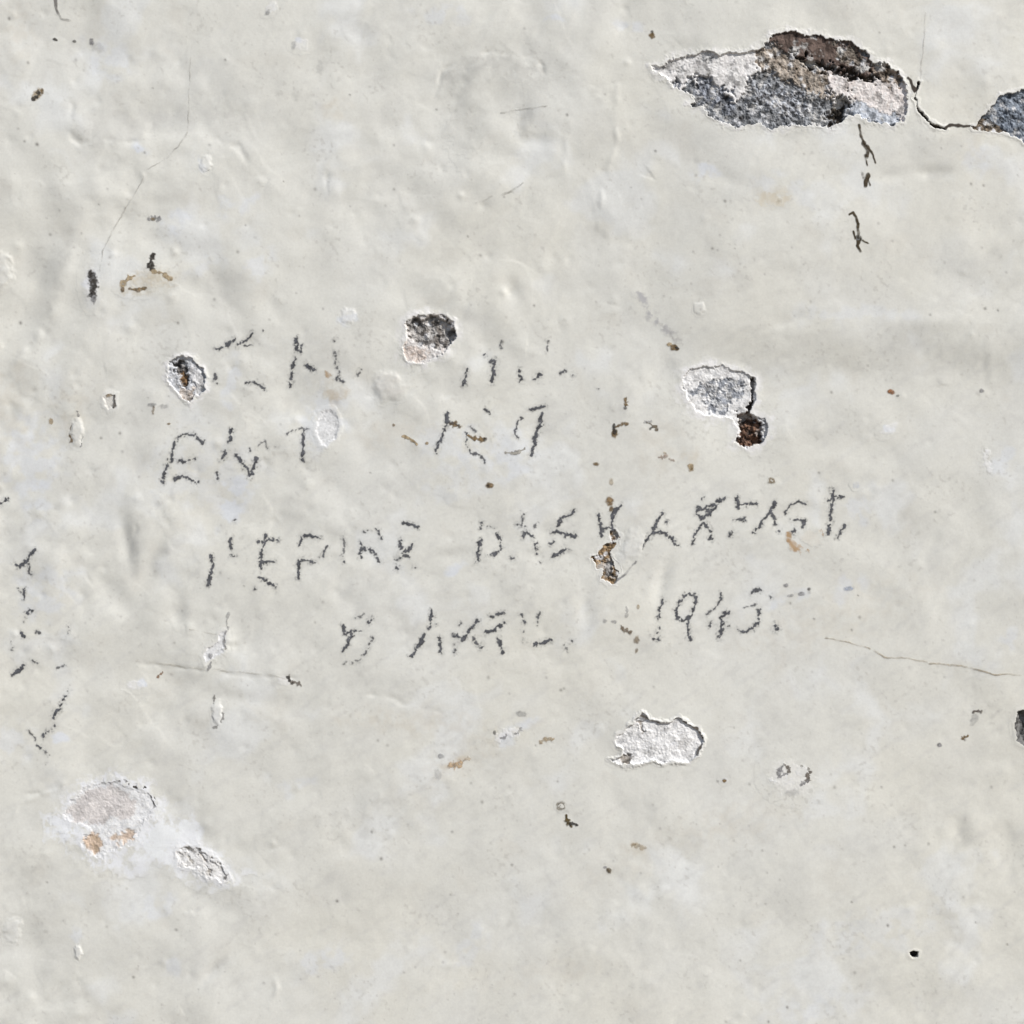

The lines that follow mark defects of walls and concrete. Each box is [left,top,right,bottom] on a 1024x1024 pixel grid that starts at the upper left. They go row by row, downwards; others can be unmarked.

spalling [642,20,917,138]
crack [907,77,974,136]
spalling [966,84,1024,147]
spalling [391,302,467,376]
spalling [157,348,214,412]
spalling [667,342,779,459]
spalling [605,708,708,771]
spalling [1009,703,1024,751]
spalling [46,762,171,878]
spalling [166,836,246,892]